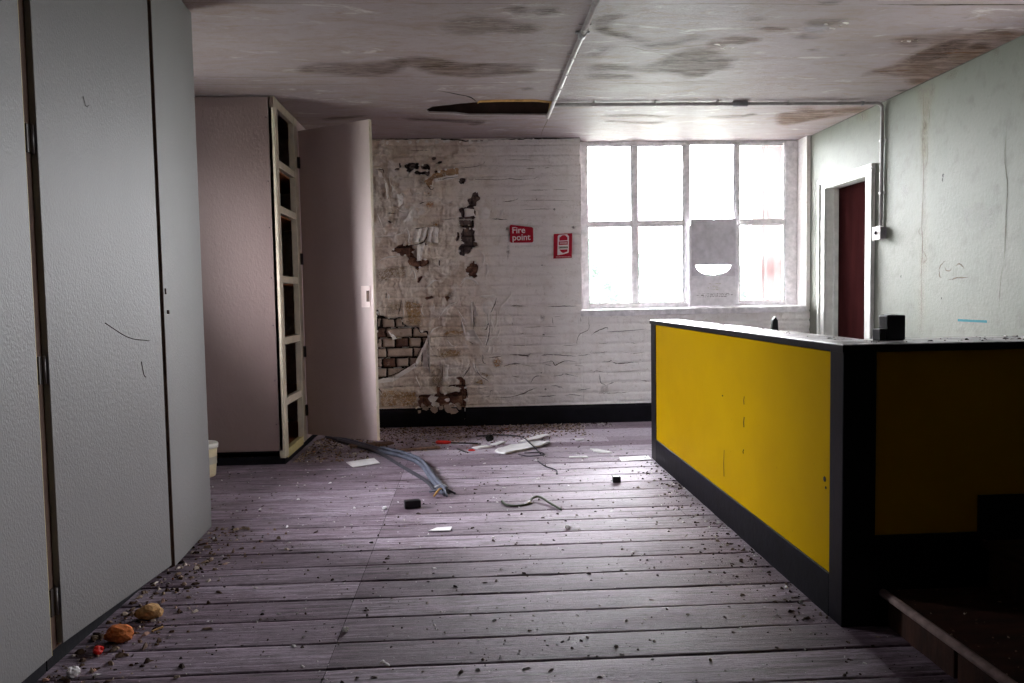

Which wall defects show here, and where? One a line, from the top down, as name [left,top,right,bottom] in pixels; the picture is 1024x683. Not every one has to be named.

leakage [649,29,785,77]
leakage [873,31,1014,91]
spalling [378,171,440,283]
spalling [395,157,482,279]
flaking render [376,310,430,384]
spalling [414,364,469,414]